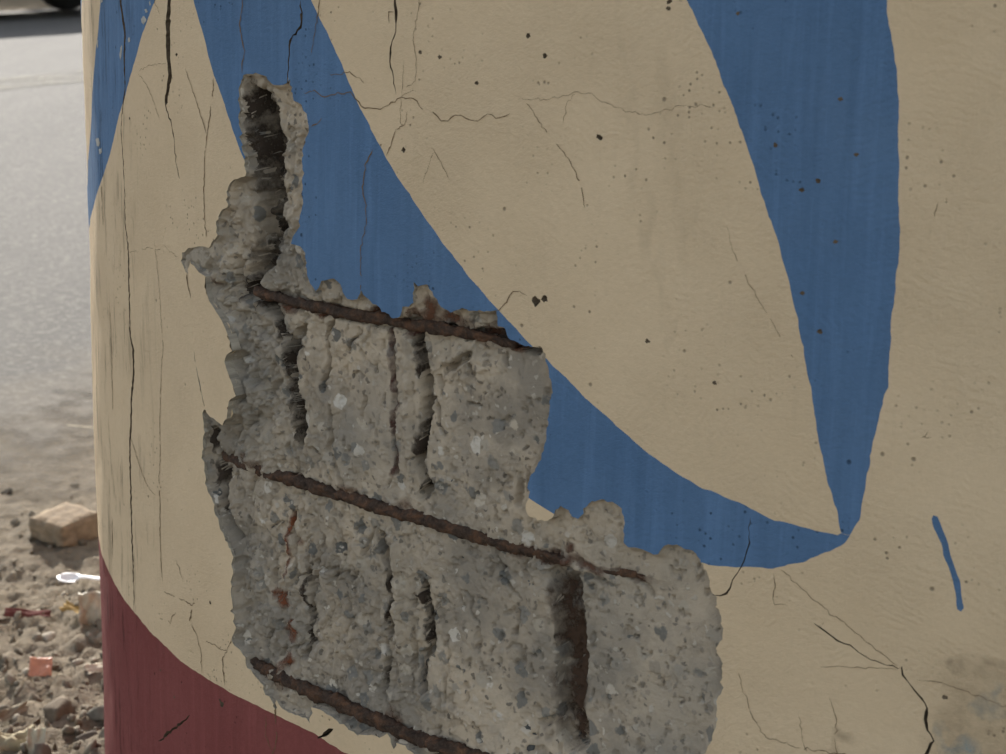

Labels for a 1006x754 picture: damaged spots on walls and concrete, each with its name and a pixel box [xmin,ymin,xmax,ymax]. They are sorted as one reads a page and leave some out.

crack [101,0,214,602]
corrosion [408,331,430,379]
corrosion [216,462,233,484]
corrosion [412,418,433,455]
spalling [181,73,723,754]
crack [159,528,231,685]
corrosion [272,569,318,642]
corrosion [384,575,395,622]
corrosion [416,585,437,643]
corrosion [541,543,603,738]
crack [773,571,1006,754]
crack [739,676,845,754]